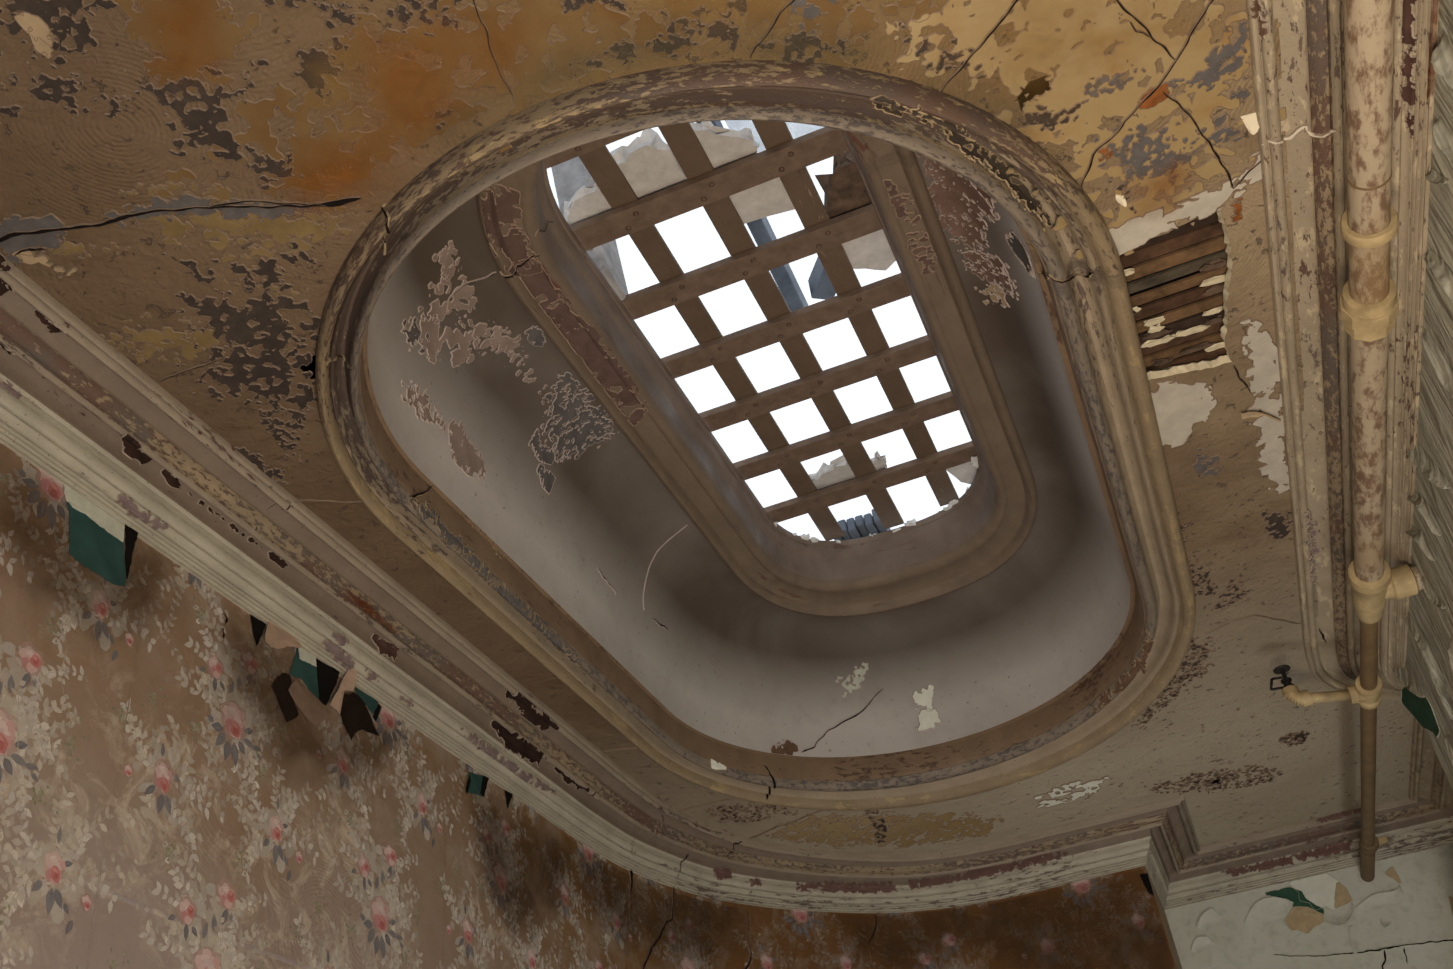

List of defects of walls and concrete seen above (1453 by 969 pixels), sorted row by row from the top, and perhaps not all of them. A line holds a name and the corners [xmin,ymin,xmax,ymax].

crack [939,0,1018,92]
crack [1080,0,1338,189]
flaking render [0,0,367,489]
crack [0,196,390,256]
peeling [869,0,1320,585]
flaking render [64,484,169,542]
peeling [298,633,402,682]
peeling [460,689,598,799]
crack [802,689,883,753]
peeling [1401,612,1453,766]
crack [725,765,823,859]
crack [1273,940,1453,969]